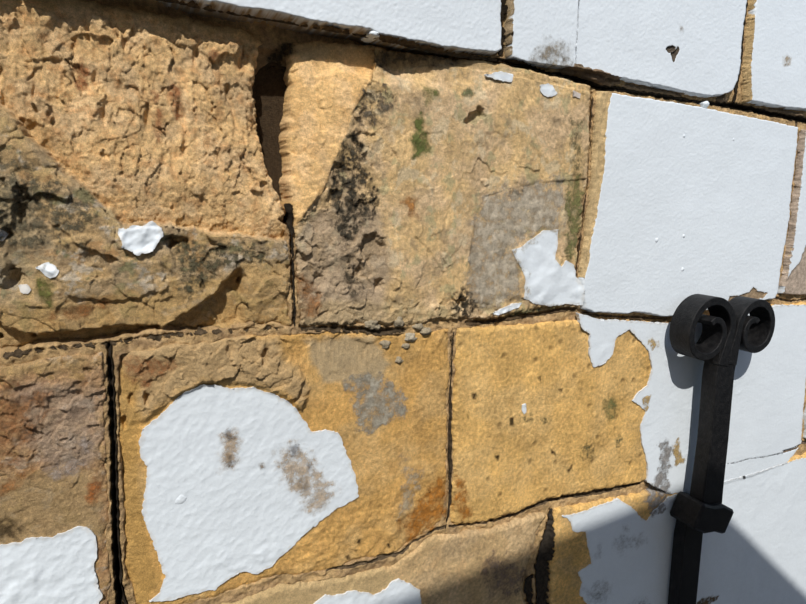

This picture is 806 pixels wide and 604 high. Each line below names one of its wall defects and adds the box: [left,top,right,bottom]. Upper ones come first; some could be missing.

spalling [0,0,376,256]
crack [156,0,806,272]
peeling [0,526,103,604]
spalling [0,267,248,349]
crack [3,203,405,604]
peeling [139,384,359,602]
crack [326,307,667,604]
peeling [493,91,704,604]
leakage [673,438,684,466]
peeling [696,129,806,604]
crack [727,441,806,464]
crack [767,295,806,303]